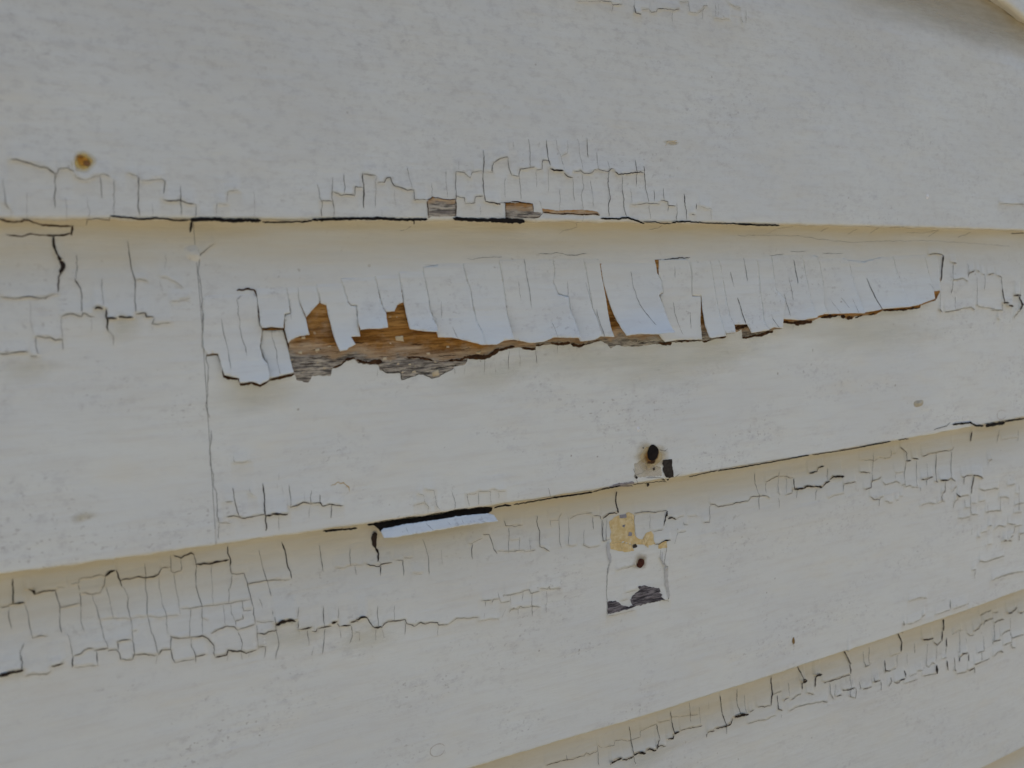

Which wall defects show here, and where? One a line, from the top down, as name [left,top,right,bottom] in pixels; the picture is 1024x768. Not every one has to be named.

rust [74,154,92,169]
crack [317,139,707,219]
peeling [203,251,941,387]
crack [0,159,550,653]
peeling [368,507,498,538]
crack [471,466,854,616]